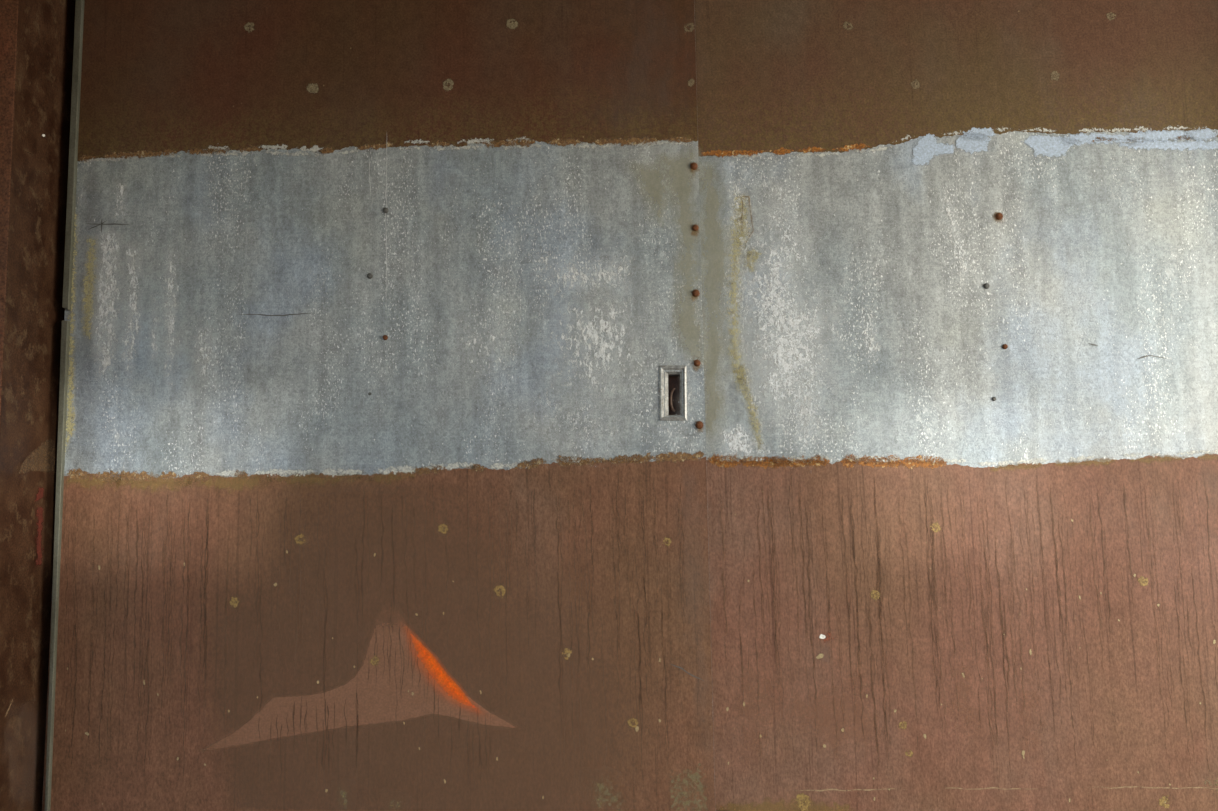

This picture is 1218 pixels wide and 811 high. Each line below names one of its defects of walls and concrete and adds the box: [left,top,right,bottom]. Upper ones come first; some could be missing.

corrosion [79,143,262,161]
peeling [200,144,357,157]
peeling [399,137,542,151]
corrosion [481,136,692,148]
peeling [569,140,693,150]
peeling [856,125,1218,166]
corrosion [515,143,947,470]
peeling [216,461,517,477]
peeling [846,455,1048,467]
corrosion [992,459,1114,471]
corrosion [1132,455,1218,463]